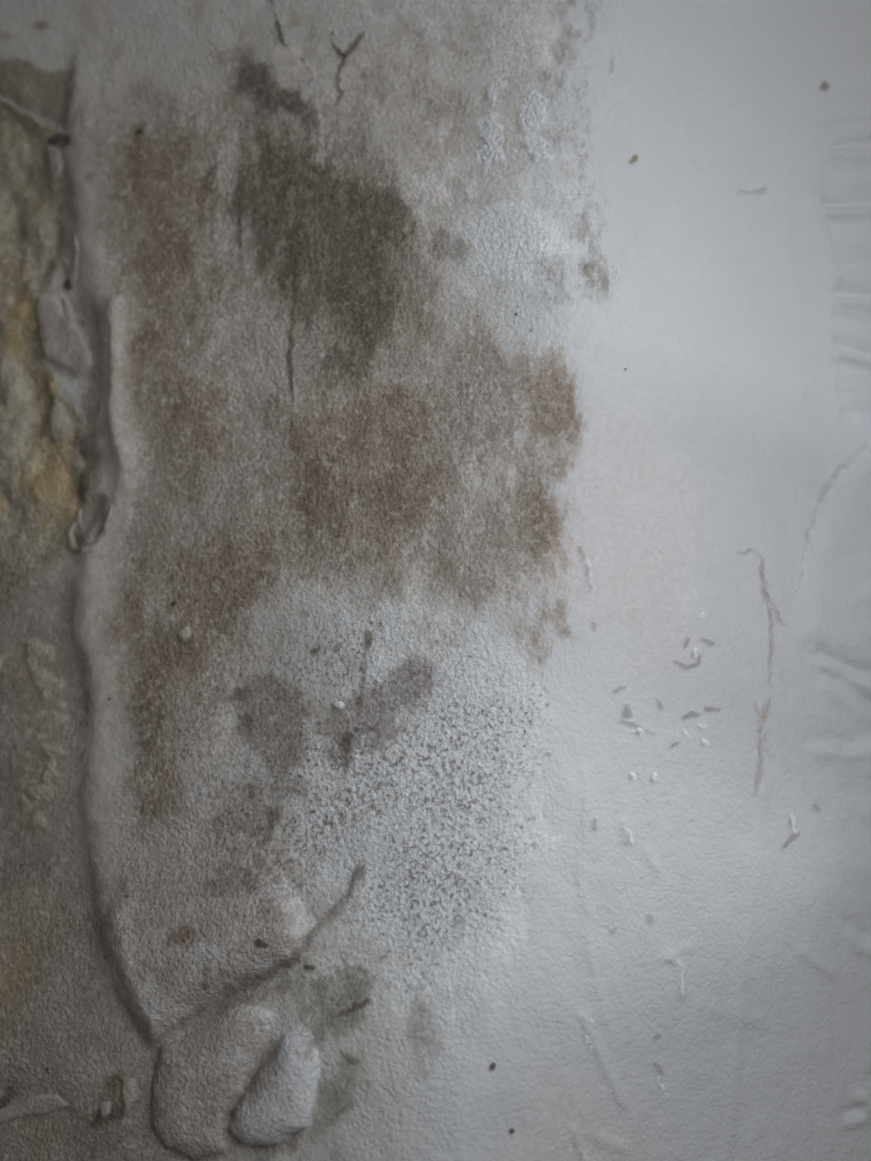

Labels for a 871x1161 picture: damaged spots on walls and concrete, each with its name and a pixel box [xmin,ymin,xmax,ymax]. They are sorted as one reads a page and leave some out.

crack [262,0,365,104]
peeling [0,104,150,1161]
leakage [0,46,580,1156]